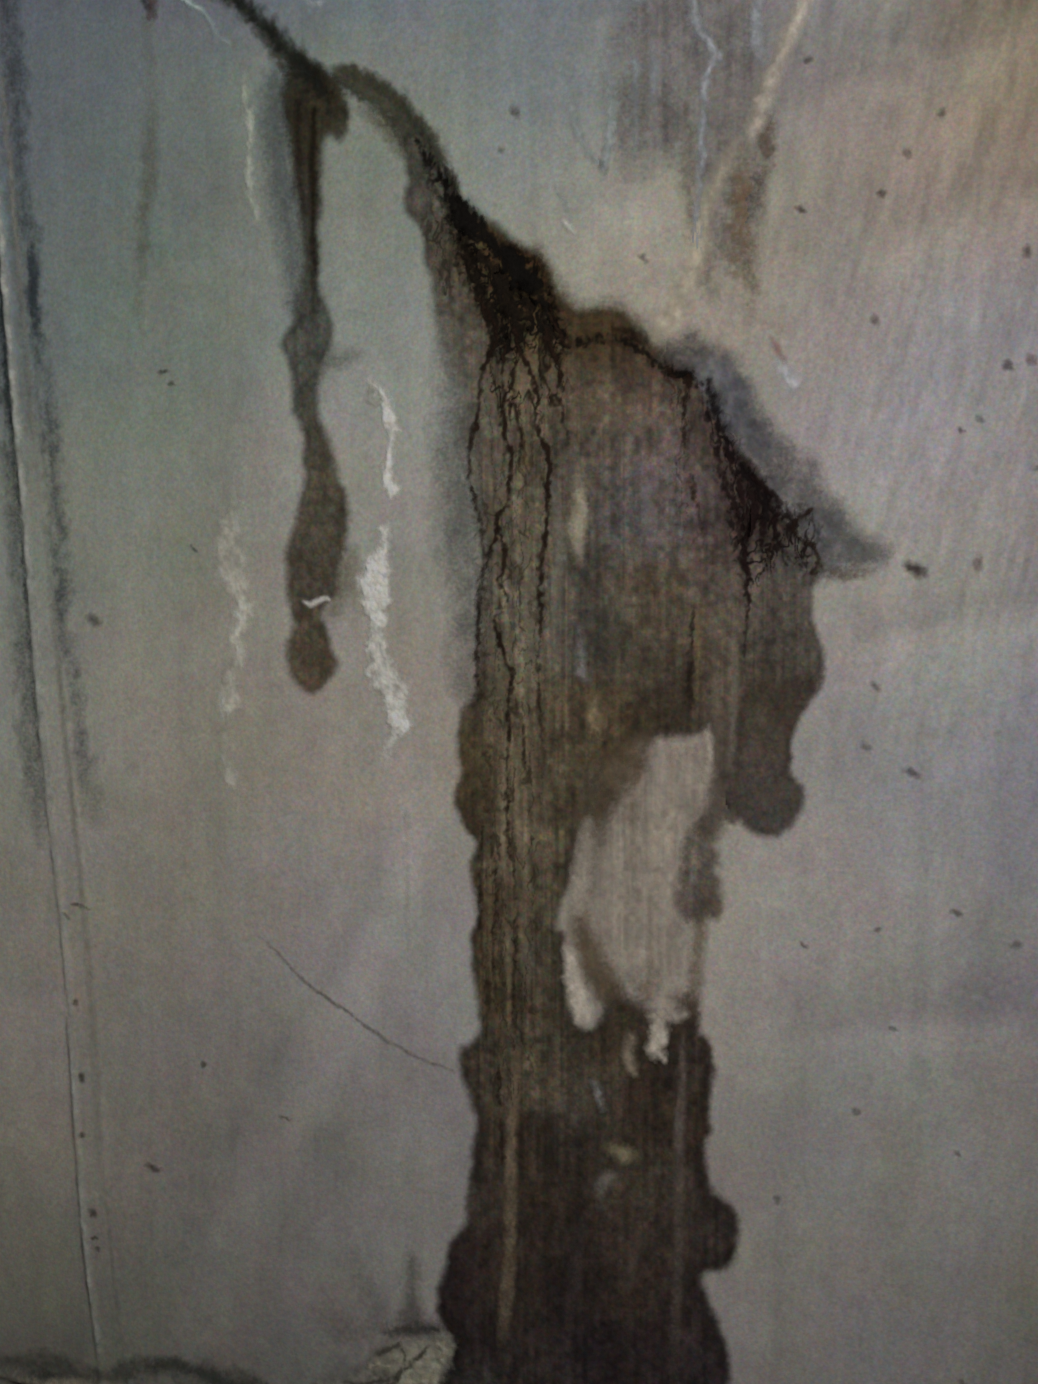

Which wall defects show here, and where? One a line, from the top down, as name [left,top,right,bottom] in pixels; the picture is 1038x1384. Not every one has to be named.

water stain [689,0,720,94]
water stain [0,286,12,423]
water stain [26,246,40,362]
water stain [241,57,411,758]
crack [224,0,871,985]
efflorescence [217,516,254,728]
water stain [396,123,876,1384]